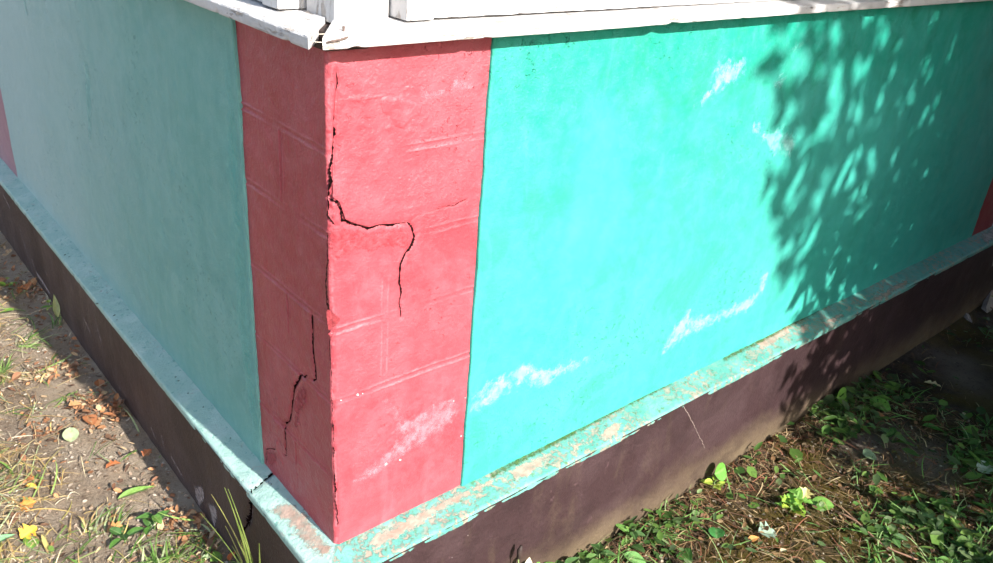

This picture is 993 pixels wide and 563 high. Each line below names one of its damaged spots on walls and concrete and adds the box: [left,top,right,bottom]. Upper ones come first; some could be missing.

crack [242,73,415,537]
spalling [327,310,340,336]
peeling [756,324,809,351]
peeling [370,400,454,472]
peeling [601,423,621,439]
peeling [509,454,548,480]
peeling [369,480,493,552]